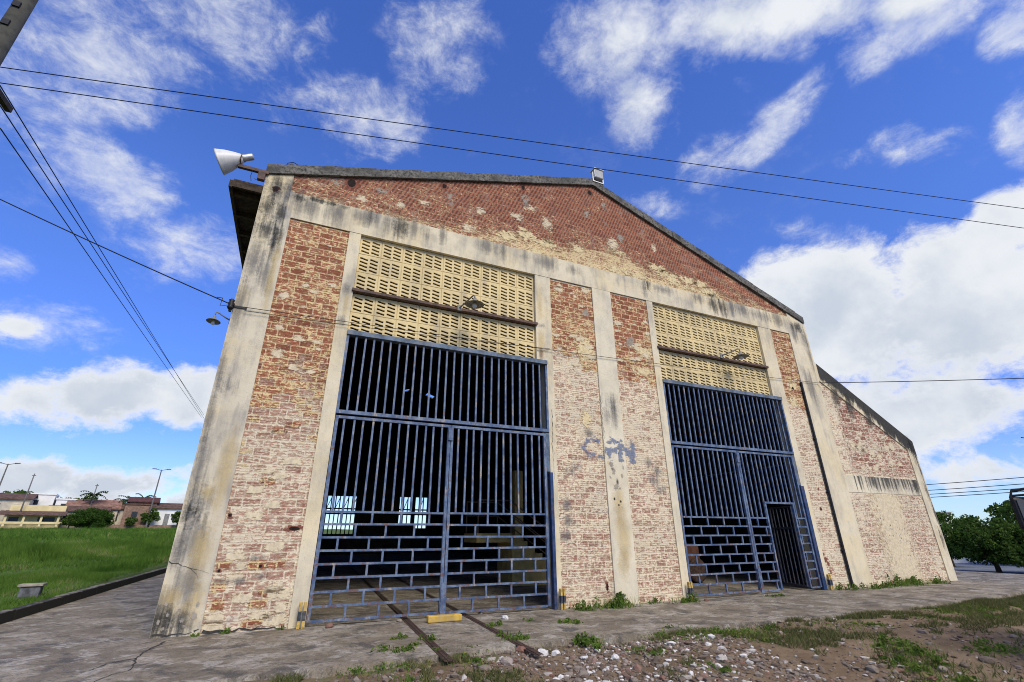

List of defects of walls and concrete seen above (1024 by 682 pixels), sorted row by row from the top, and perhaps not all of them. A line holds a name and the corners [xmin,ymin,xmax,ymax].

damp [250,178,347,280]
peeling [272,176,785,316]
damp [809,353,943,540]